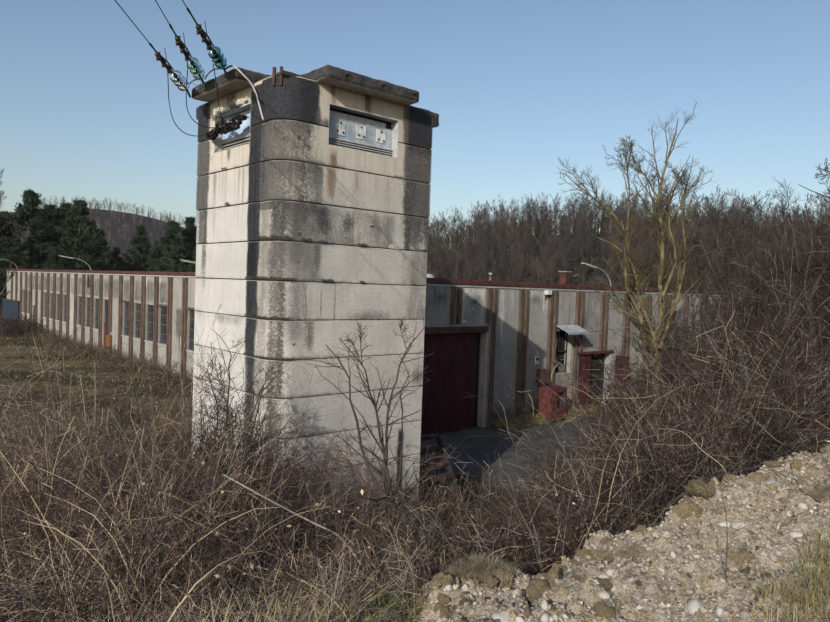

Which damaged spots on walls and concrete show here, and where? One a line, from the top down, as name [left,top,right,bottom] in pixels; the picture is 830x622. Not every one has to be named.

water stain [196,102,210,280]
water stain [243,76,391,469]
water stain [401,106,433,298]